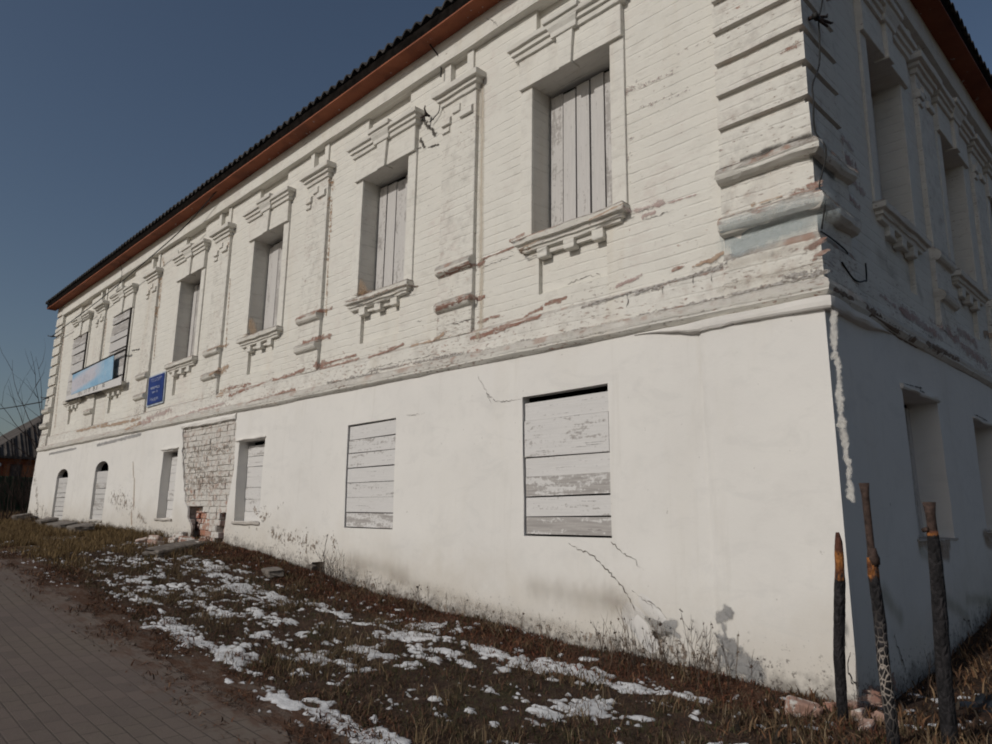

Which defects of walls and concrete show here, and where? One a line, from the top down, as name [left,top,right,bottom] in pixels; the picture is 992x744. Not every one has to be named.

peeling [589,194,696,221]
peeling [751,180,823,207]
peeling [564,237,831,332]
peeling [833,287,992,370]
peeling [76,294,567,447]
flaking render [183,420,237,543]
crack [570,542,664,615]